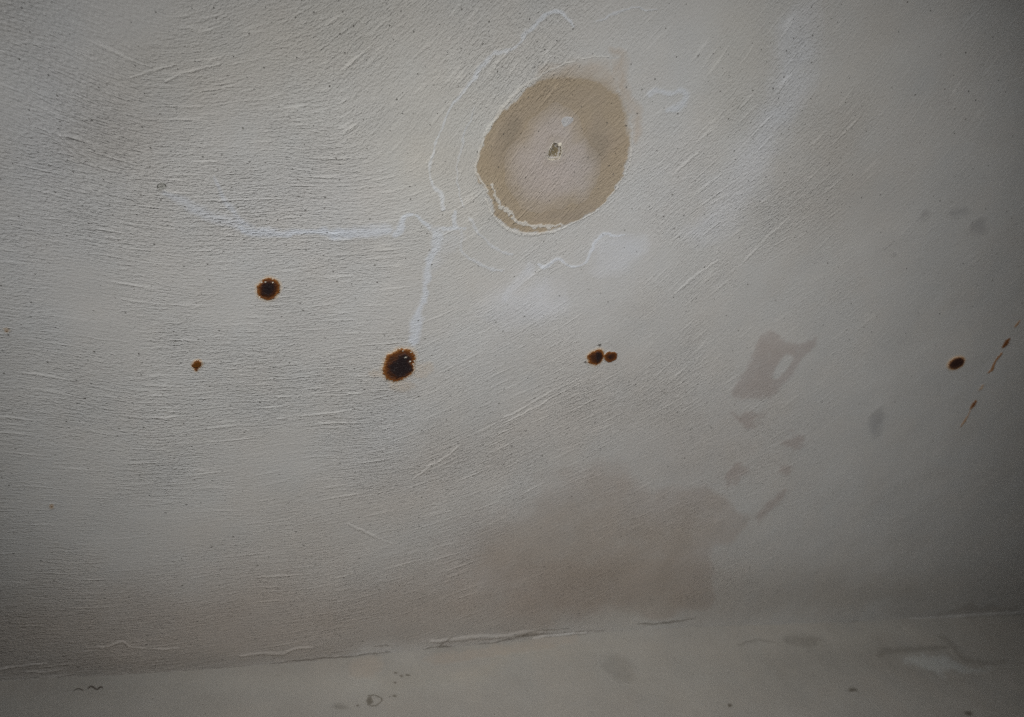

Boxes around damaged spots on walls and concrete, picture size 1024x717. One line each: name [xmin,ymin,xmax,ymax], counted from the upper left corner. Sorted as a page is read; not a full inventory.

damp [160,5,692,348]
corrosion [253,273,284,304]
corrosion [189,358,205,373]
corrosion [365,344,437,396]
corrosion [583,343,618,368]
corrosion [945,353,967,372]
corrosion [960,319,1021,428]